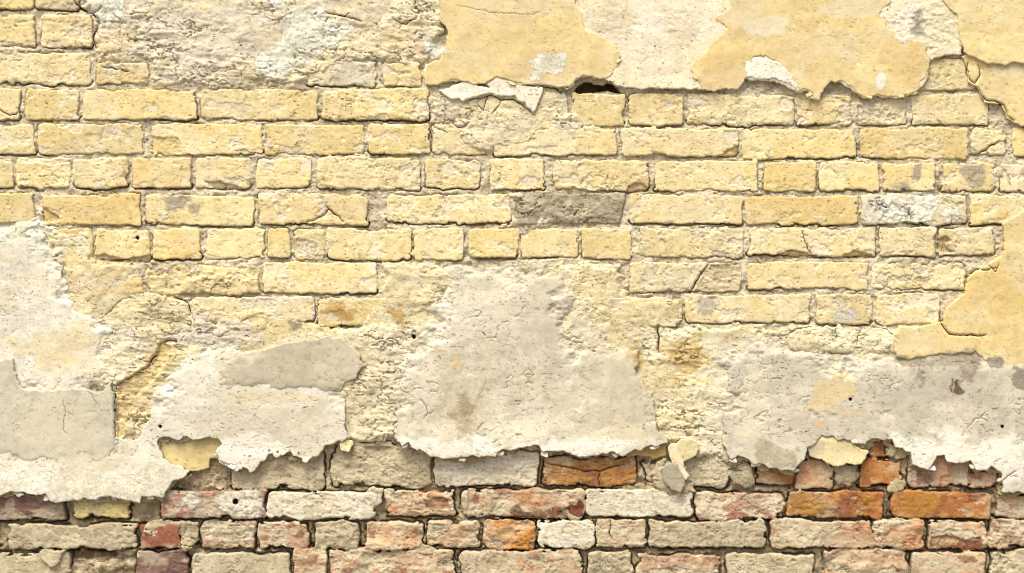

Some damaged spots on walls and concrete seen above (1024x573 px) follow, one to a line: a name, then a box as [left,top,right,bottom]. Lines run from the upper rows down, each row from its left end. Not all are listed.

flaking render [79,0,1024,156]
spalling [718,145,739,158]
spalling [205,180,246,192]
spalling [512,182,650,225]
peeling [0,207,1024,505]
spalling [424,497,451,511]
spalling [567,500,584,517]
spalling [930,535,983,553]
spalling [73,546,118,562]